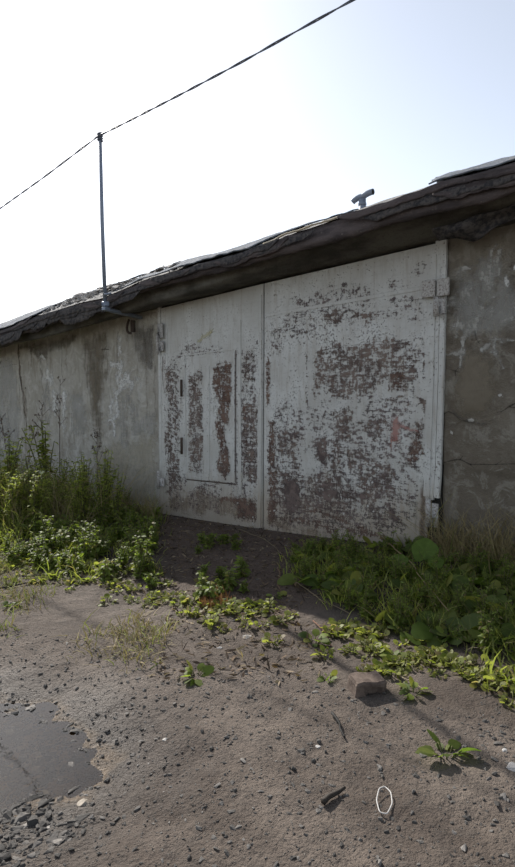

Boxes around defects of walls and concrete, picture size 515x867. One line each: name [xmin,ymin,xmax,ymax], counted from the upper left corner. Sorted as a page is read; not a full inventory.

peeling [43,261,181,312]
leakage [446,244,502,368]
leakage [85,334,139,436]
peeling [163,278,426,540]